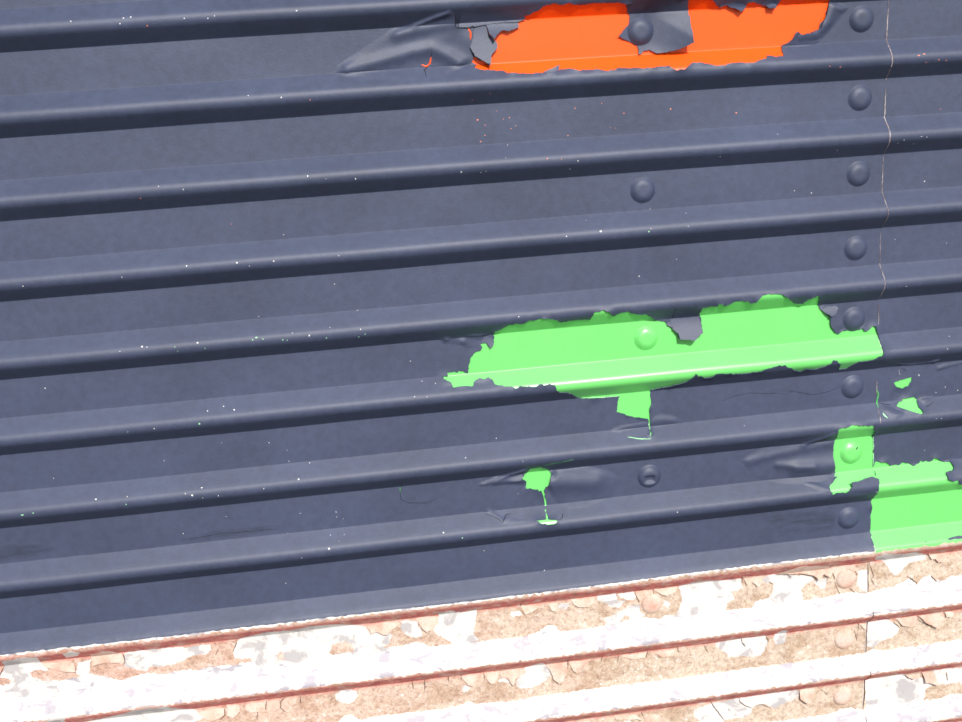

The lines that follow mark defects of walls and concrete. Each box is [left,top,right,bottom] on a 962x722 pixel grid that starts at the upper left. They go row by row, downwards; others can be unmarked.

peeling [459,0,829,74]
crack [878,1,893,325]
peeling [435,294,883,439]
peeling [510,425,962,627]
peeling [0,643,218,703]
peeling [87,697,289,722]
peeling [233,609,483,670]
peeling [461,647,679,692]
peeling [704,630,789,657]
peeling [685,688,828,722]
peeling [854,611,954,651]
peeling [862,668,962,713]